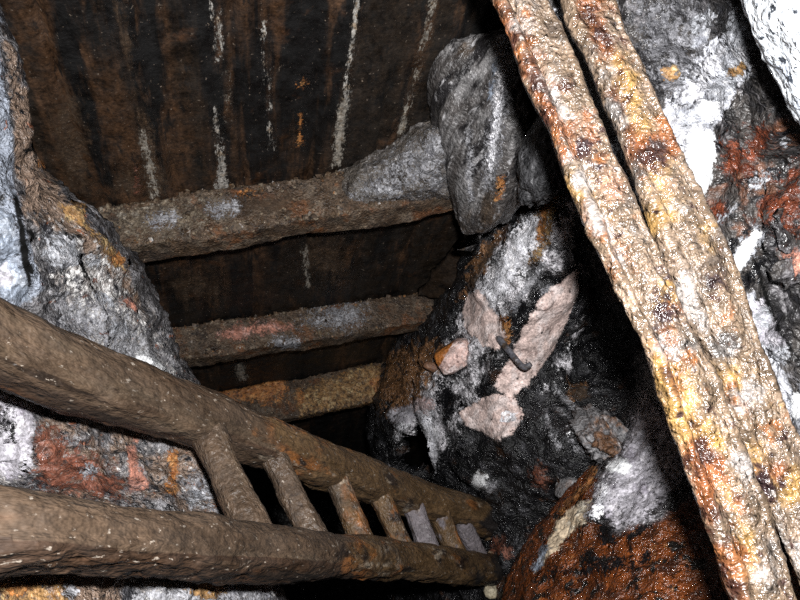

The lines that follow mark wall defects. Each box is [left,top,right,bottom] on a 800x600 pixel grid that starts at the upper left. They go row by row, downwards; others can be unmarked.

efflorescence [419,0,437,50]
efflorescence [331,0,360,167]
efflorescence [349,70,447,202]
corrosion [716,121,783,186]
corrosion [490,175,506,227]
corrosion [528,195,563,265]
corrosion [711,200,729,221]
corrosion [743,169,800,239]
corrosion [783,249,800,276]